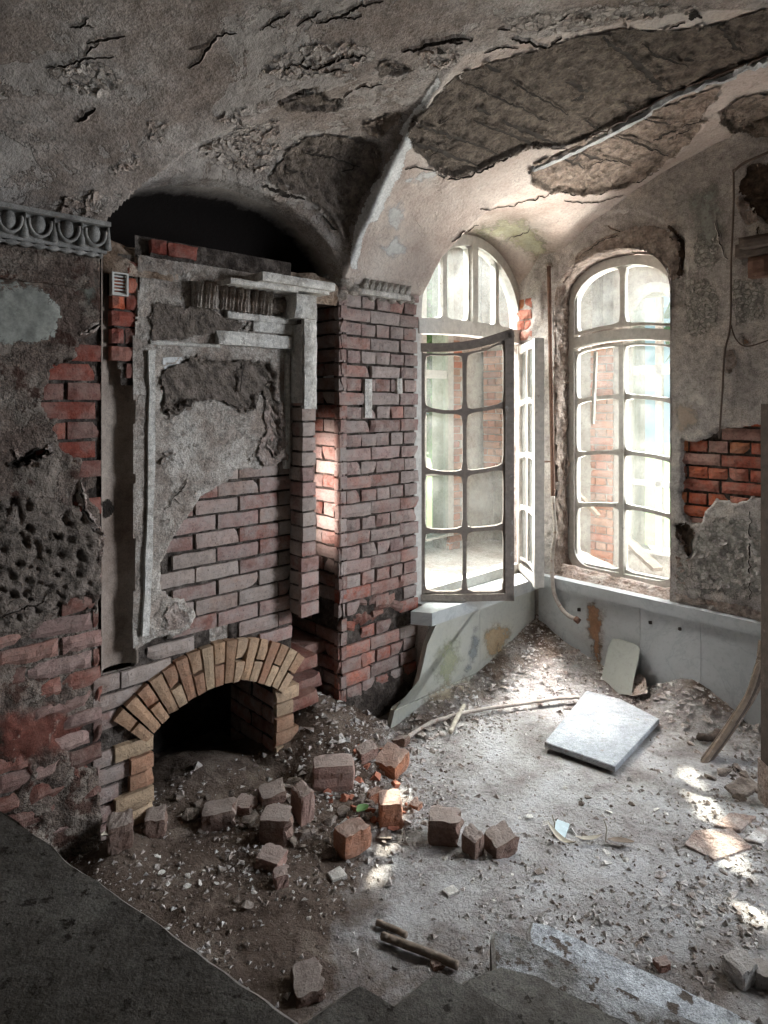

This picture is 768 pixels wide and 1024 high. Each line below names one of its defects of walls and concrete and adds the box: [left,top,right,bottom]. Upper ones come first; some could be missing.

crack [45,17,125,70]
crack [188,0,384,69]
crack [281,53,382,98]
crack [76,107,96,123]
spalling [199,42,465,238]
spalling [699,92,768,138]
crack [451,170,659,242]
spalling [161,353,289,467]
spalling [553,225,720,556]
flaking render [0,253,138,828]
flaking render [671,424,761,625]
rust [586,602,603,663]